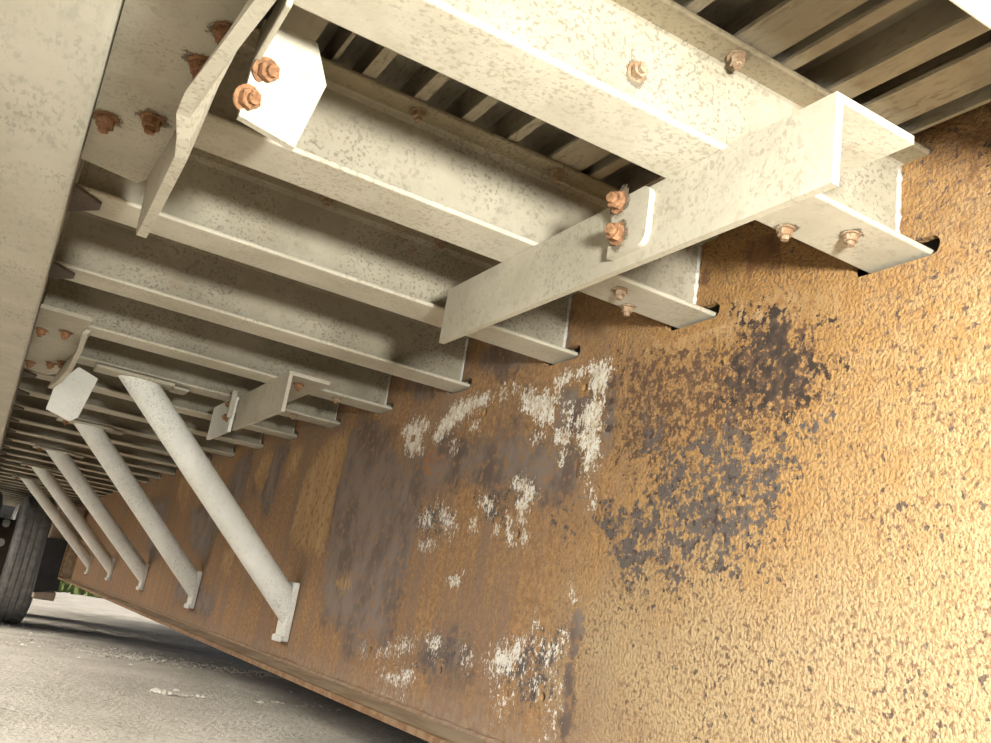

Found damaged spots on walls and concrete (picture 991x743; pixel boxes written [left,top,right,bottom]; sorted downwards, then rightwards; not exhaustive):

rust [176,474,191,514]
rust [283,419,354,562]
rust [587,229,852,613]
rust [556,602,586,743]